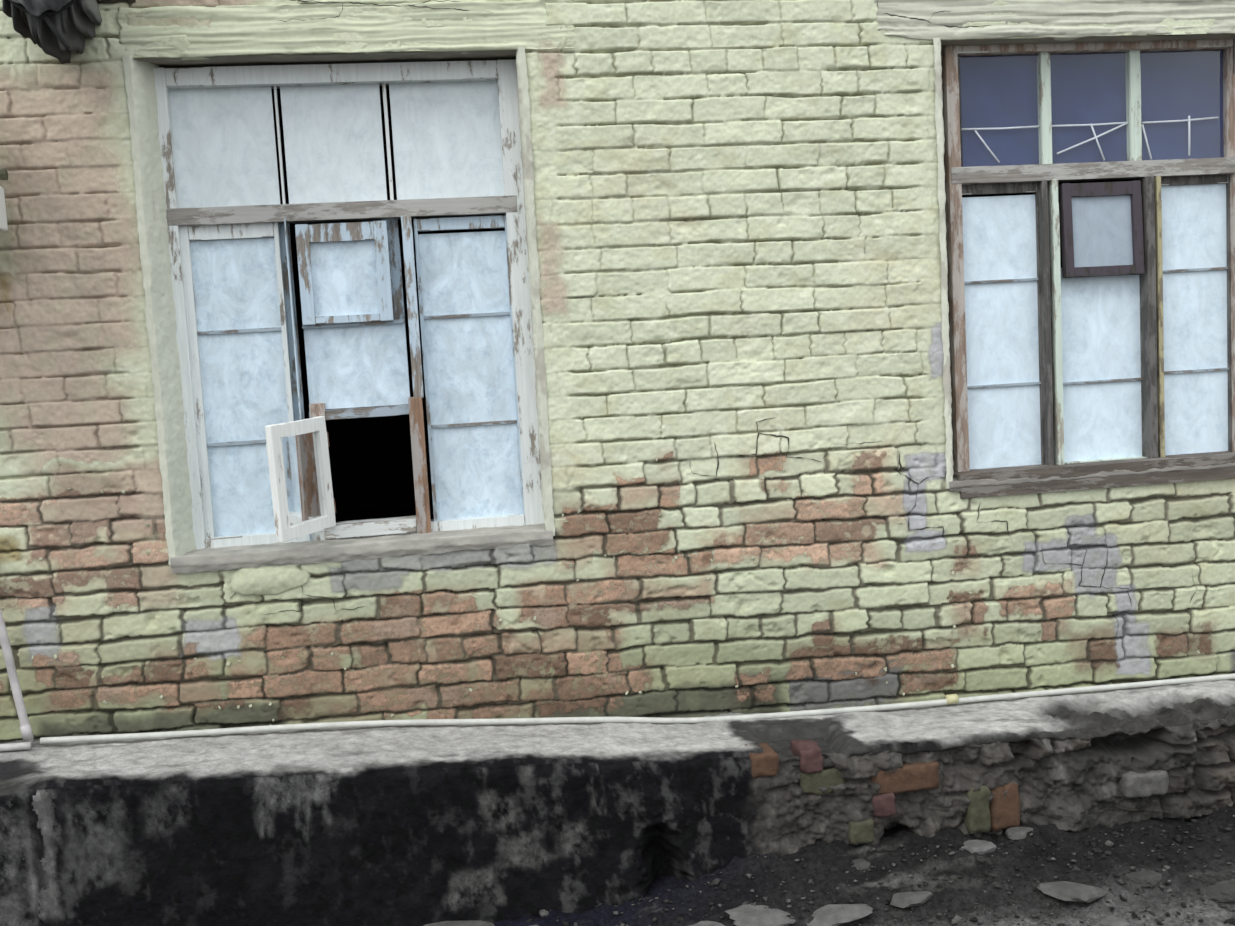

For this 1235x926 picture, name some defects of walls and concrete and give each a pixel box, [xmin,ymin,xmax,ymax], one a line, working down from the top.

peeling [0,488,169,610]
peeling [31,451,903,725]
damp [24,605,60,658]
damp [184,617,240,659]
peeling [735,581,1075,702]
peeling [1086,637,1120,667]
peeling [1156,624,1212,658]
damp [0,760,44,778]
damp [0,790,125,926]
damp [256,774,330,836]
damp [479,792,548,866]
spalling [728,715,1235,856]